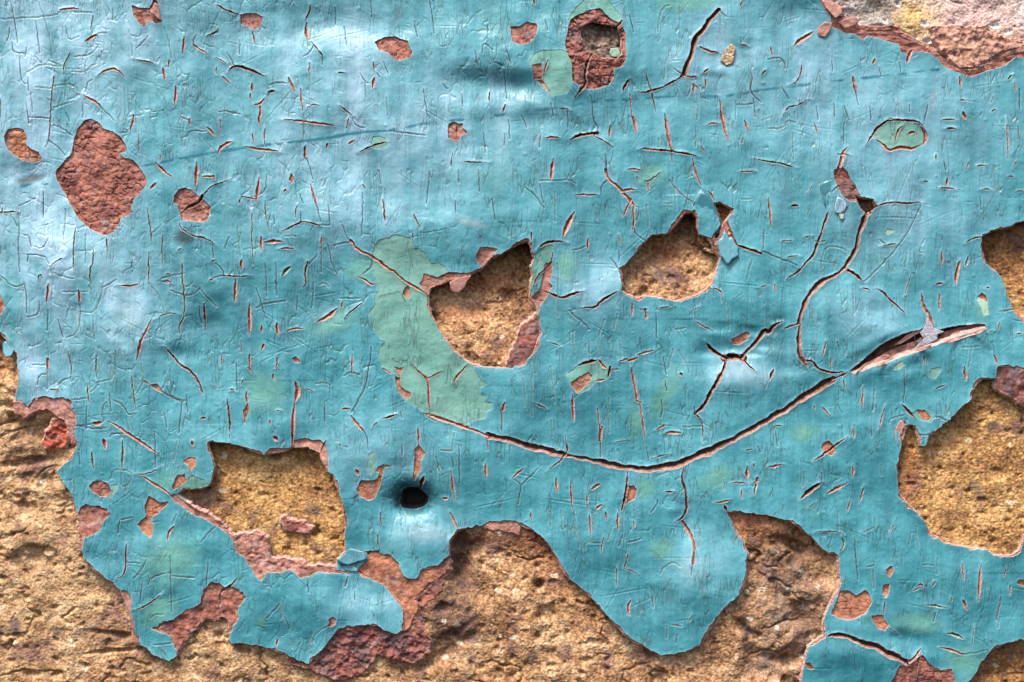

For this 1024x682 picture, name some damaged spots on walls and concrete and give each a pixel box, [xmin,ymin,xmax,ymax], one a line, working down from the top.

spalling [511,0,626,96]
spalling [817,0,1024,77]
peeling [56,119,147,235]
crack [455,9,928,240]
spalling [620,190,739,302]
spalling [981,221,1024,322]
peeling [369,234,554,426]
crack [386,180,947,581]
spalling [0,334,888,682]
spalling [895,365,1024,557]
peeling [891,655,955,682]
spalling [968,639,1024,682]